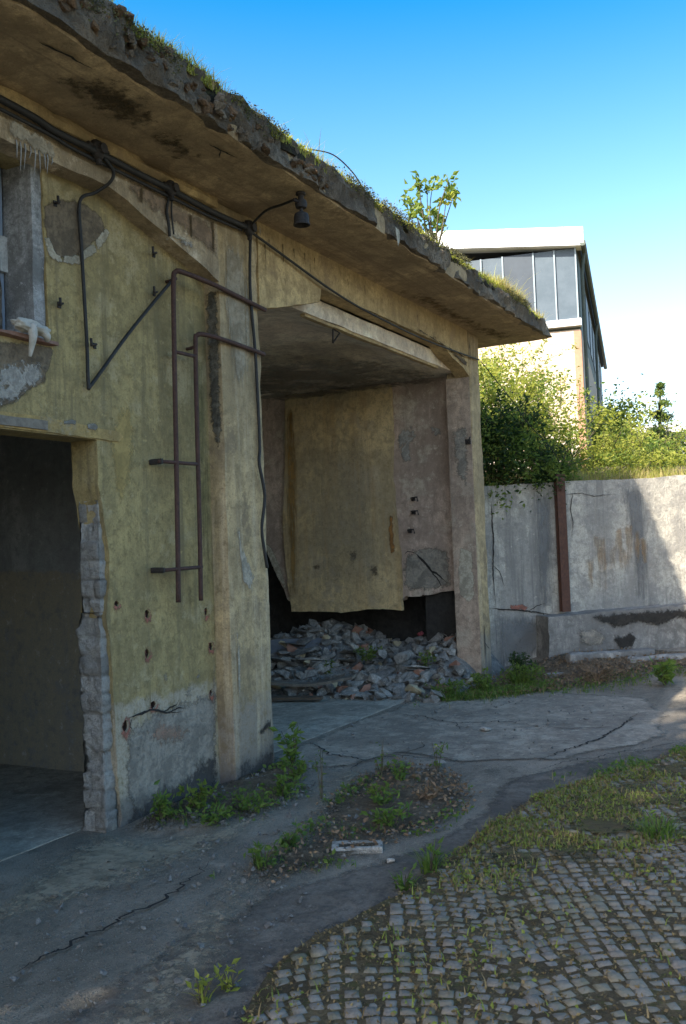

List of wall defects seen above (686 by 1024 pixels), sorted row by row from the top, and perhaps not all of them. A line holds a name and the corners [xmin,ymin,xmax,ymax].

leakage [57,78,199,159]
leakage [10,119,55,177]
flaking render [44,199,109,265]
flaking render [0,342,53,407]
crack [406,551,447,589]
crack [130,700,182,731]
crack [313,743,471,767]
crack [409,715,685,773]
crack [15,861,212,973]